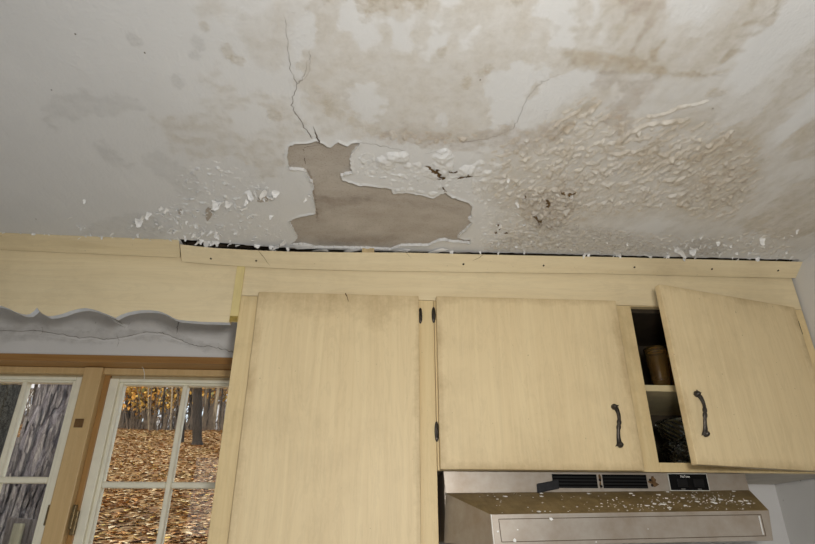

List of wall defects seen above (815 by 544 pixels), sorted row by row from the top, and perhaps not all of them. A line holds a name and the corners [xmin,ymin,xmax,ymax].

crack [283,15,320,164]
peeling [31,138,475,253]
spalling [484,178,802,261]